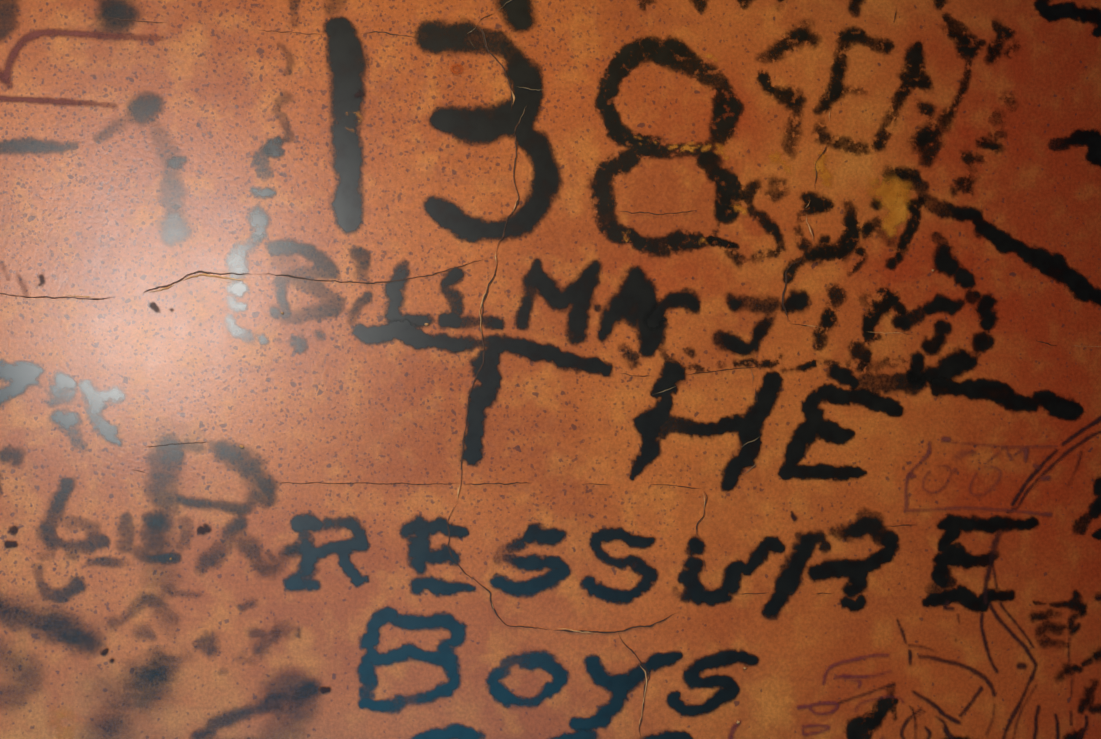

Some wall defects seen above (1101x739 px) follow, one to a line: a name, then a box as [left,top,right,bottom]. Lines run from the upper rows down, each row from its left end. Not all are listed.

crack [621,208,699,216]
crack [0,0,676,739]
crack [622,366,758,402]
crack [650,484,707,535]